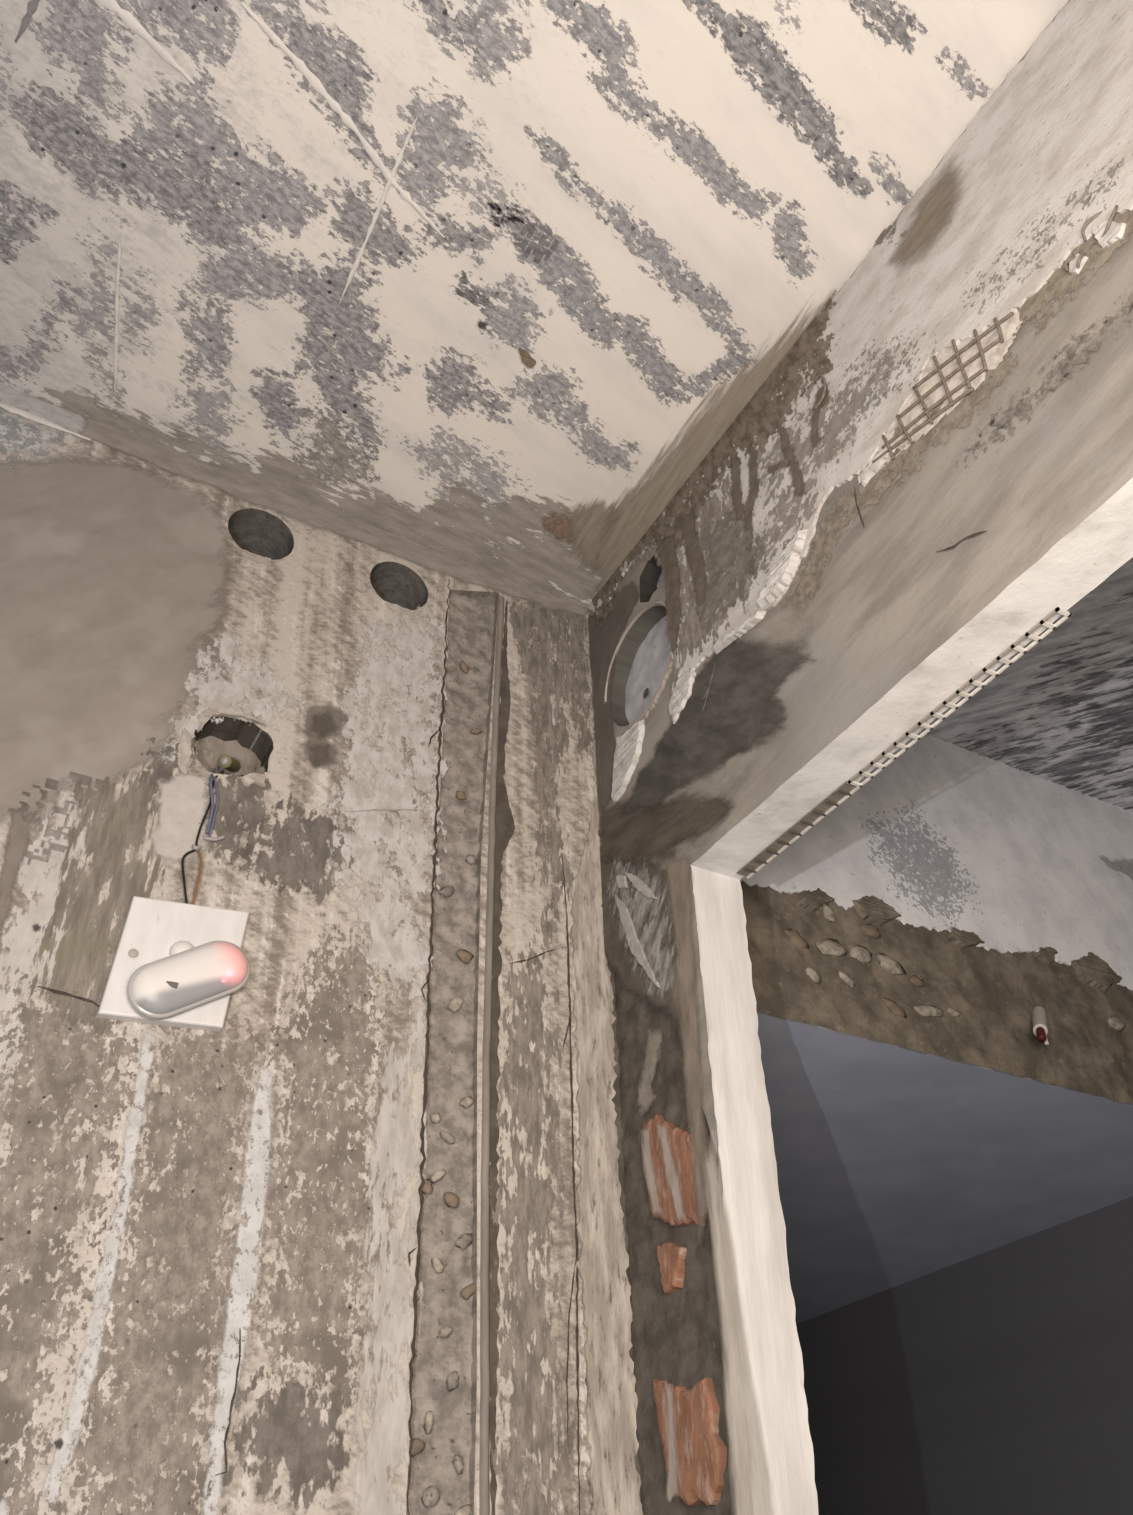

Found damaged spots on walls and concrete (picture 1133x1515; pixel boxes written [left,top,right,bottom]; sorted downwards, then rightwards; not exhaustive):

crack [14,0,40,43]
spalling [244,550,271,565]
spalling [385,601,410,615]
peeling [0,0,818,518]
damp [588,291,874,1019]
flaking render [588,0,1133,724]
damp [874,171,958,263]
flaking render [570,709,727,1515]